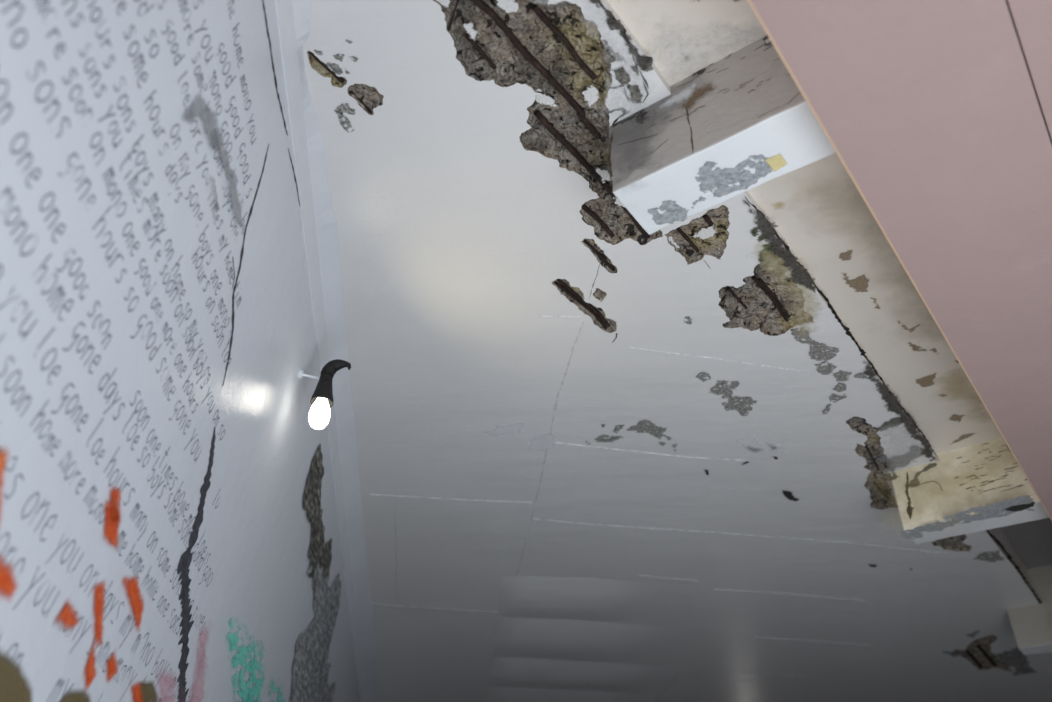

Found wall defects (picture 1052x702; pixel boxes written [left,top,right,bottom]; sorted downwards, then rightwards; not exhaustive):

spalling [307,40,384,132]
water stain [662,63,713,105]
spalling [433,0,772,273]
water stain [612,108,648,127]
spalling [552,279,617,333]
spalling [718,263,869,414]
peeling [696,372,756,416]
peeling [586,420,677,451]
spalling [846,394,937,510]
spalling [943,630,1038,675]